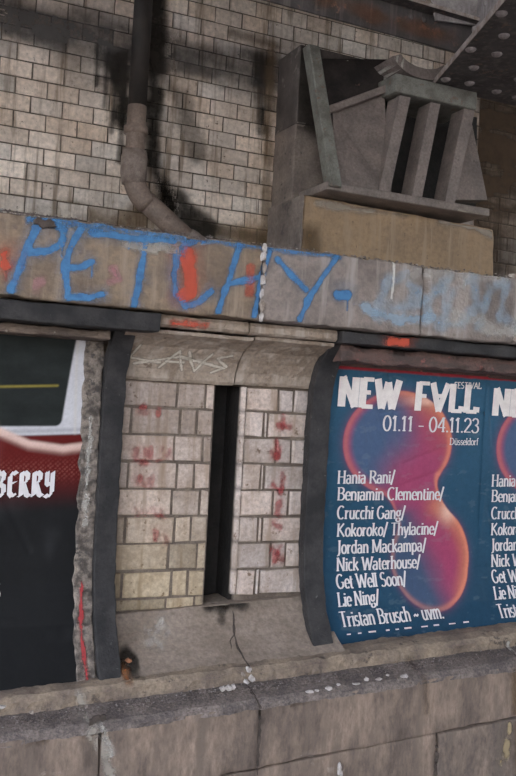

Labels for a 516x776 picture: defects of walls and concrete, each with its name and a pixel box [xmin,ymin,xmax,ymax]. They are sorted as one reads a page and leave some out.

water stain [253,50,274,161]
crack [230,613,262,775]